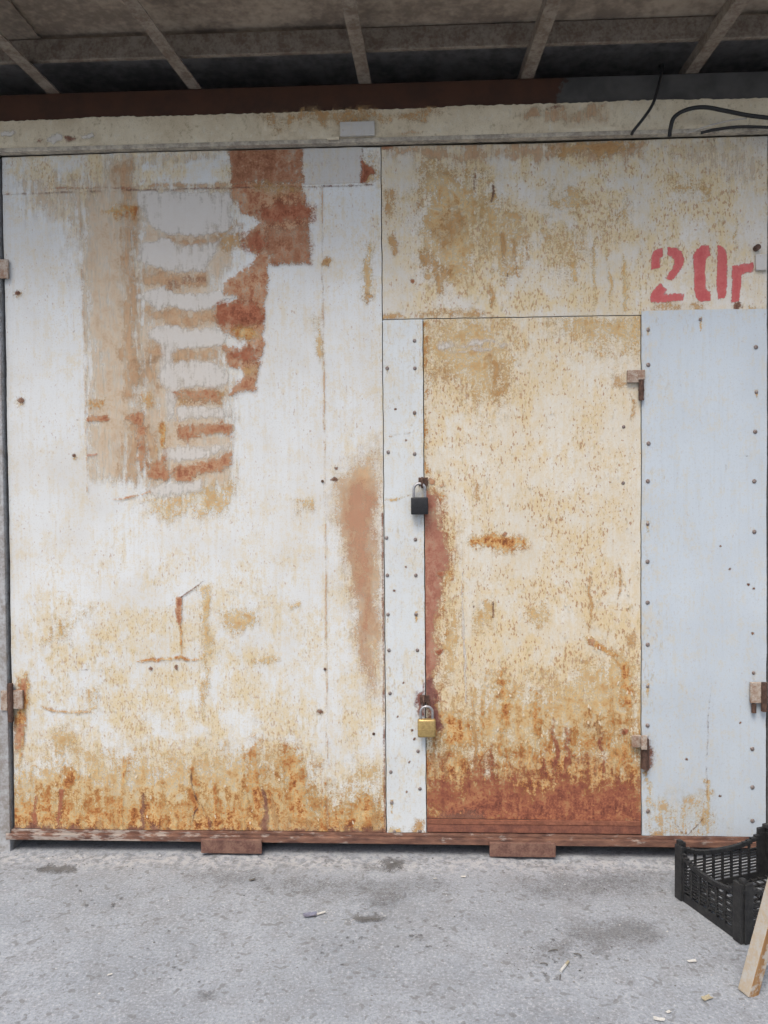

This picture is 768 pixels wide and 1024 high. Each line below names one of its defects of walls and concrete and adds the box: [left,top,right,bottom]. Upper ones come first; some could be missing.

corrosion [150,149,331,405]
corrosion [362,244,373,302]
corrosion [360,155,379,183]
corrosion [411,159,488,294]
corrosion [14,310,713,836]